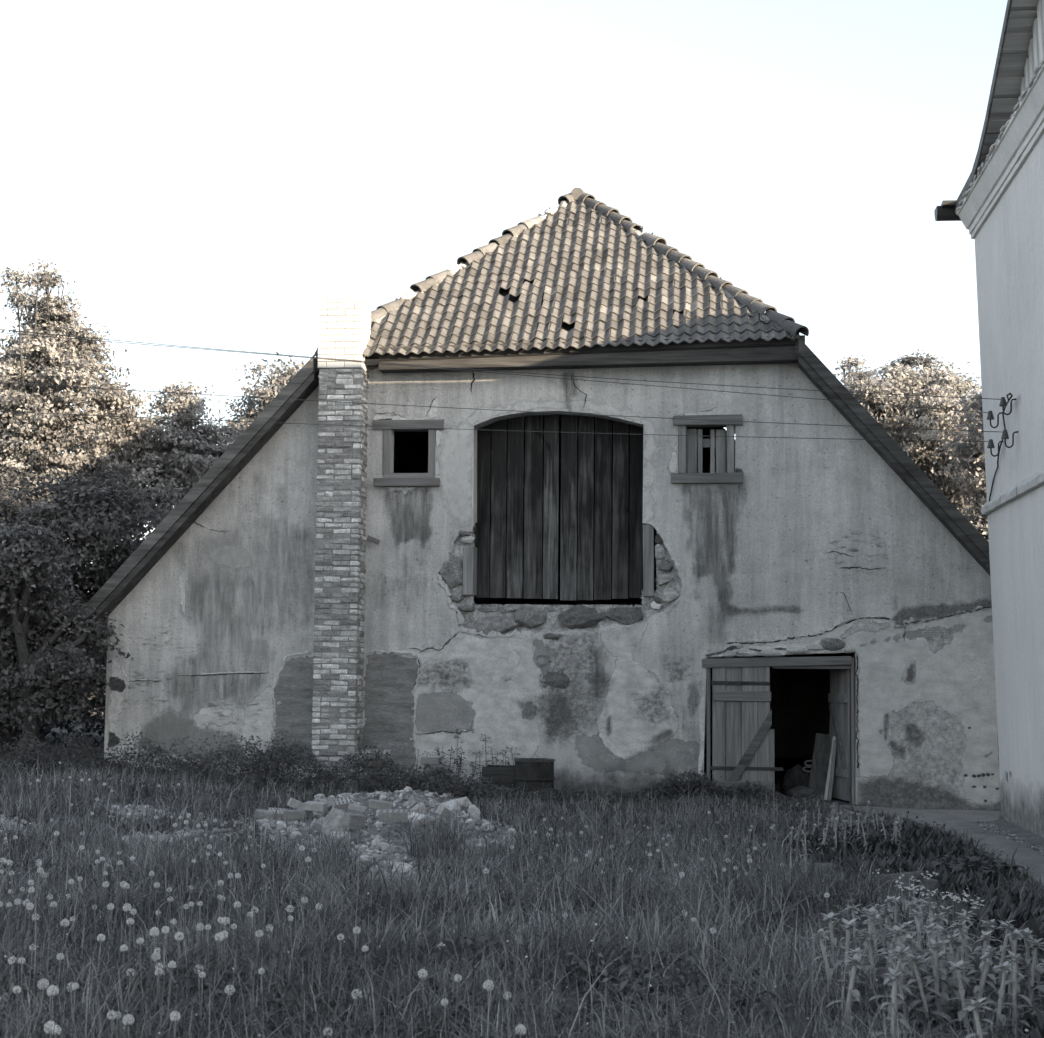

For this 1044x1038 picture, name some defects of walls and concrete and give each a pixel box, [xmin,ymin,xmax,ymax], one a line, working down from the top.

damp [386,489,430,543]
damp [696,487,798,613]
crack [179,669,264,677]
peeling [192,650,314,759]
damp [541,637,605,738]
peeling [367,523,1001,807]